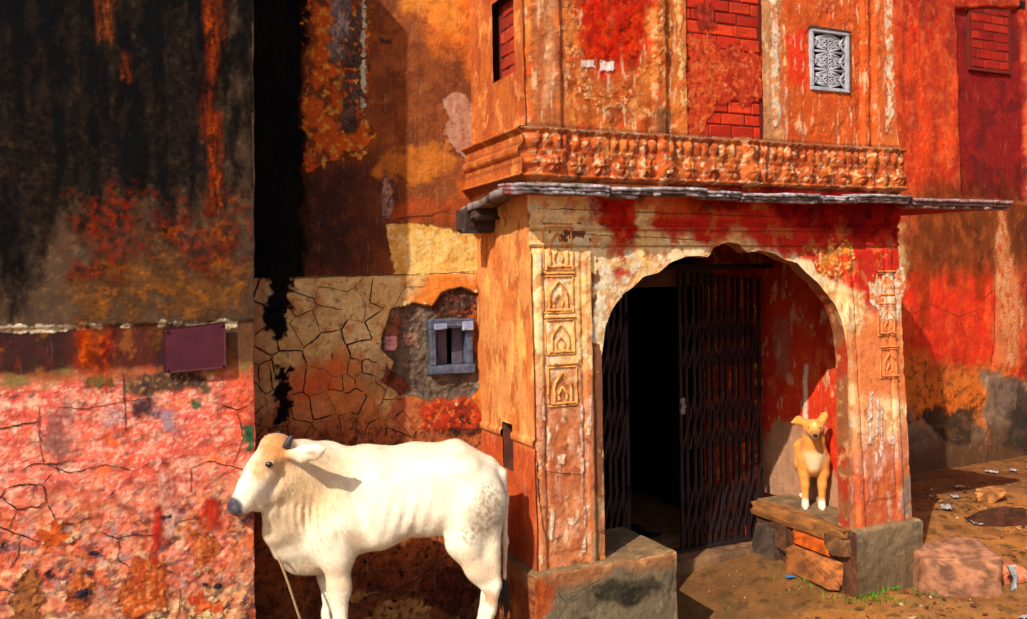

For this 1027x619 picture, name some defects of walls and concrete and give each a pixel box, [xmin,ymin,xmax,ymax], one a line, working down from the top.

damp [0,0,312,341]
flaking render [381,177,477,276]
damp [909,178,1027,368]
damp [270,365,295,425]
crack [190,270,477,491]
spalling [379,287,480,406]
damp [907,406,977,446]
damp [1004,381,1027,453]
crack [0,372,201,605]
damp [592,577,661,607]